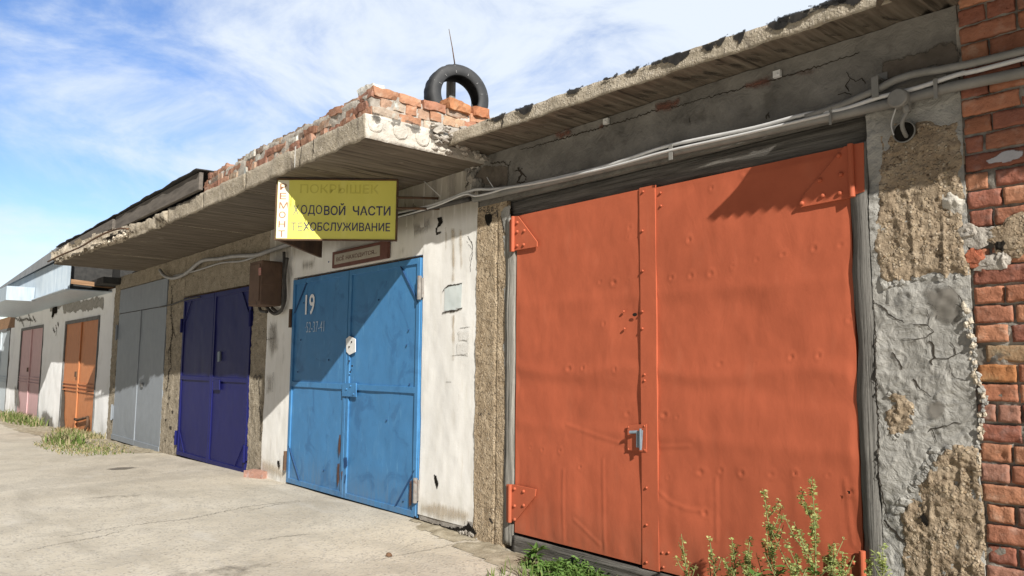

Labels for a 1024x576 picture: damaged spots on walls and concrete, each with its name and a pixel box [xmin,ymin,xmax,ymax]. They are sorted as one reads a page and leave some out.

crack [465,52,866,187]
spalling [47,225,132,262]
flaking render [874,121,1024,289]
flaking render [884,390,917,441]
crack [873,286,967,545]
flaking render [891,301,989,576]